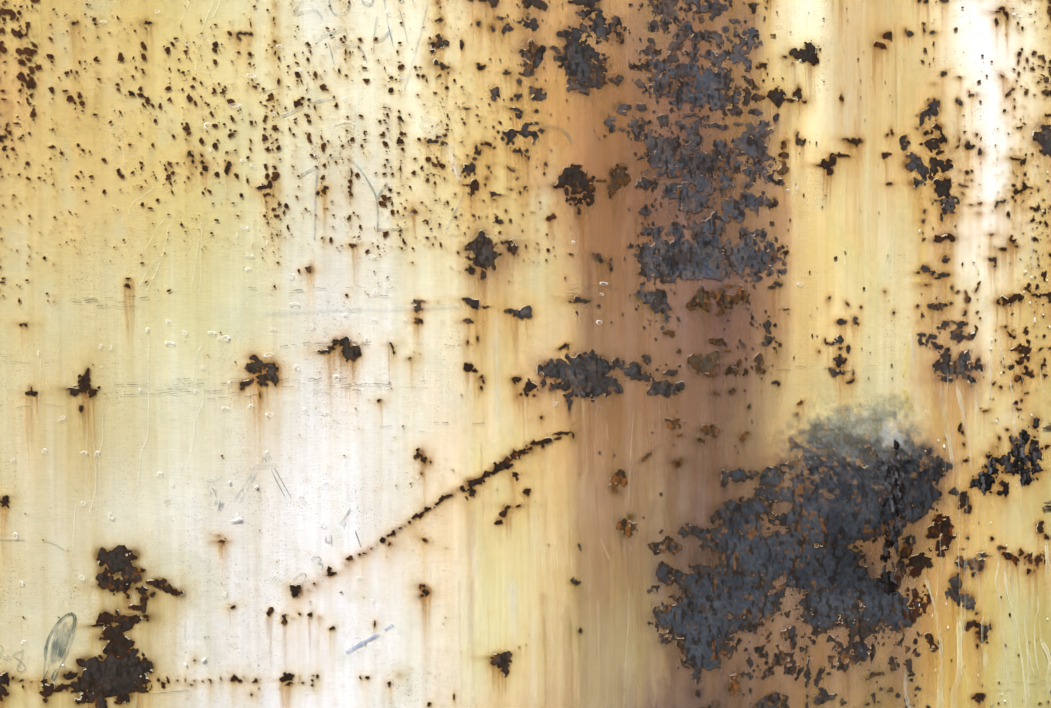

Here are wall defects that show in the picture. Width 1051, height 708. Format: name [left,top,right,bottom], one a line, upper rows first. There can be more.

peeling [593,0,804,392]
corrosion [237,353,282,408]
corrosion [316,336,362,369]
corrosion [345,0,1051,708]
spalling [968,415,1051,508]
peeling [631,517,671,555]
corrosion [0,545,258,708]
corrosion [266,607,335,631]
peeling [647,578,671,642]
peeling [691,547,941,707]
corrosion [279,672,319,689]